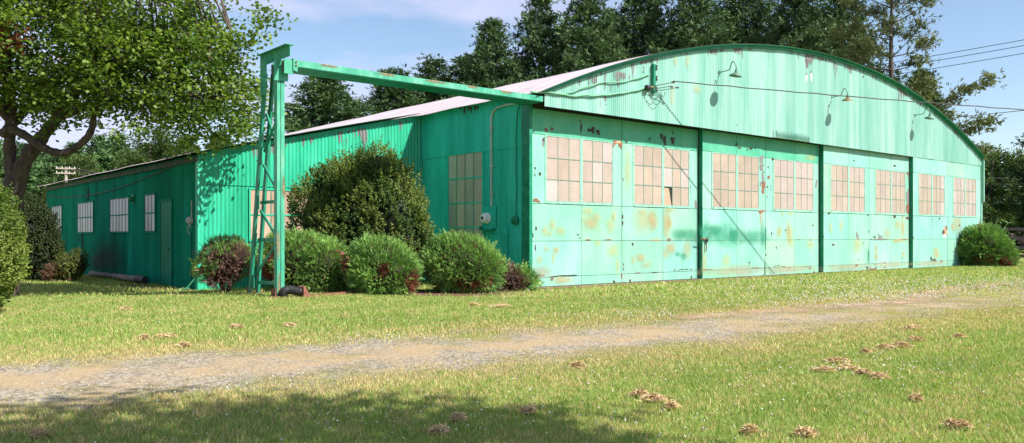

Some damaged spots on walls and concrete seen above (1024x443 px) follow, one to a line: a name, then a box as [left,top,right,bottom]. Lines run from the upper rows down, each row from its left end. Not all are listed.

peeling [790,51,886,83]